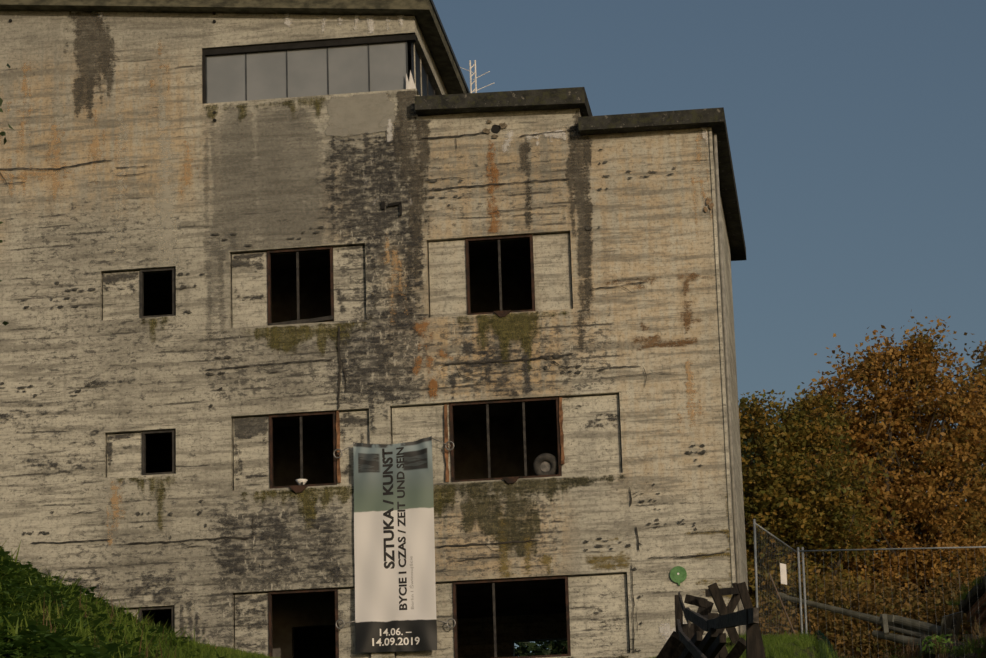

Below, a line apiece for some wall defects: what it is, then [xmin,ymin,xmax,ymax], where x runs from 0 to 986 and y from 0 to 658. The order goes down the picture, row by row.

leakage [64,11,120,119]
corrosion [486,141,499,233]
leakage [254,90,431,433]
leakage [449,110,593,398]
leakage [433,475,616,574]